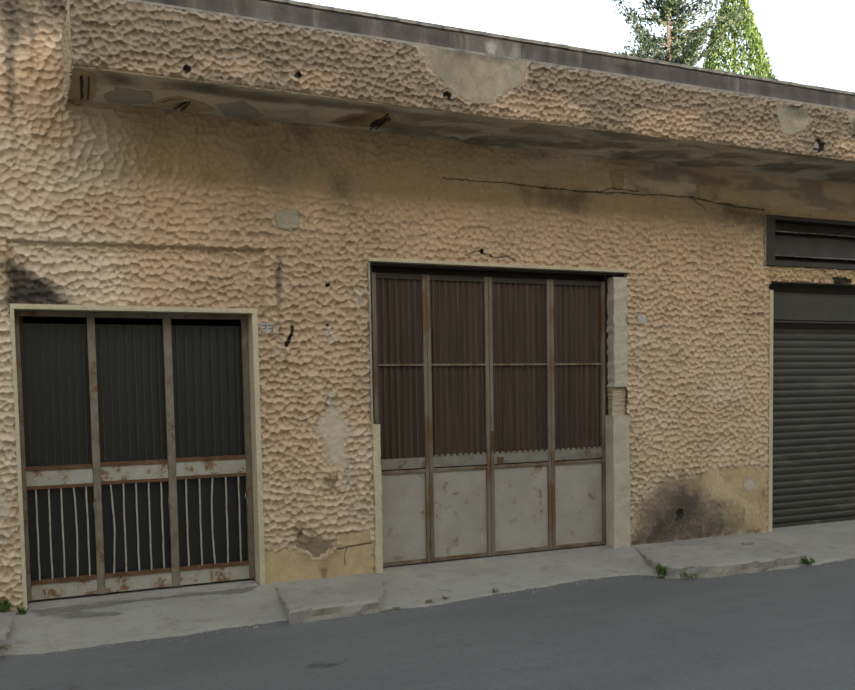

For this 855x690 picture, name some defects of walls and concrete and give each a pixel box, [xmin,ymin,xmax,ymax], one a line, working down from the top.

flaking render [401,42,526,105]
crack [443,177,764,211]
flaking render [317,388,355,486]
rust [26,455,246,471]
rust [27,473,246,490]
rust [31,560,249,585]
flaking render [264,530,375,584]